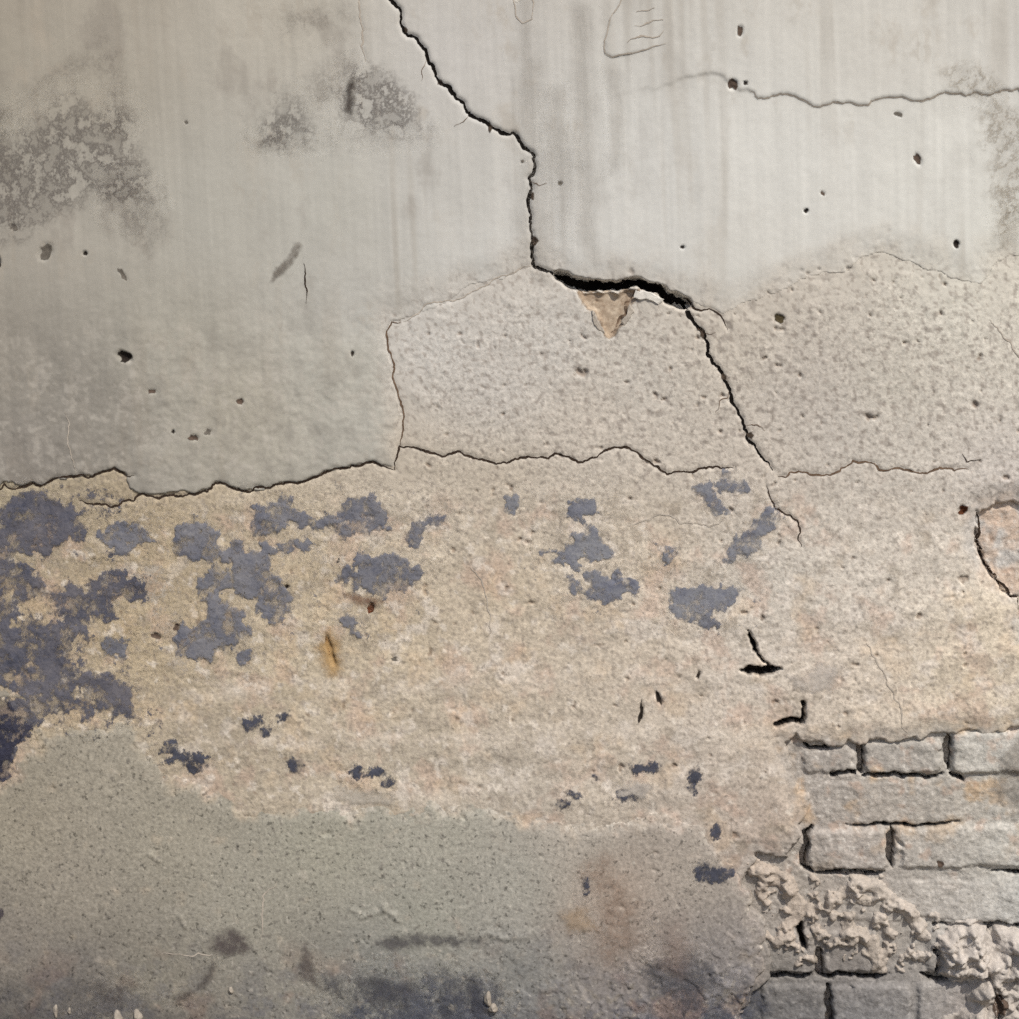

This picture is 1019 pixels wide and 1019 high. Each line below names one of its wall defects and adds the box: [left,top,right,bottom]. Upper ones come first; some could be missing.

crack [0,0,1019,546]
flaking render [577,289,664,339]
peeling [0,481,450,783]
rust [319,634,339,672]
peeling [524,494,684,614]
peeling [666,581,741,635]
peeling [692,468,785,564]
flaking render [958,501,1019,619]
flaking render [693,726,1019,1019]
water stain [215,931,248,954]
water stain [382,935,479,948]
water stain [350,983,491,1019]